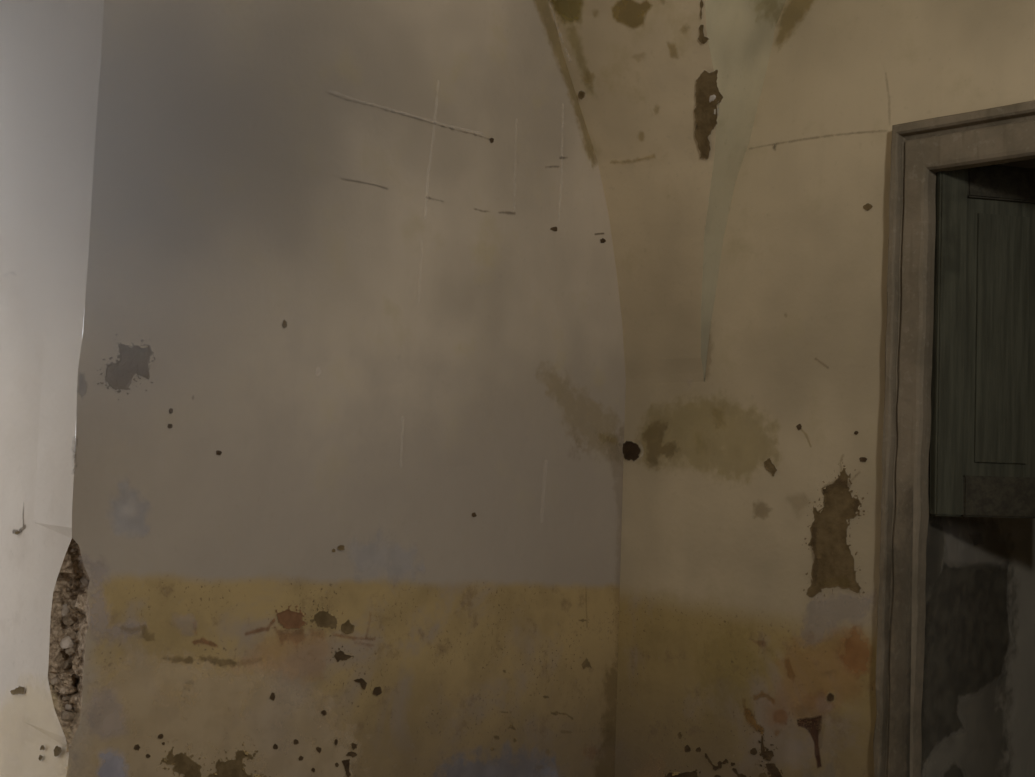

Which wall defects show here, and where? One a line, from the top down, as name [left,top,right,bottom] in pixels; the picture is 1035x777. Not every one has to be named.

leakage [613,0,650,28]
peeling [694,70,723,159]
peeling [79,334,155,400]
peeling [803,463,868,599]
flaking render [38,538,90,761]
flaking render [134,734,267,777]
peeling [335,743,357,777]
flaking render [659,730,783,777]